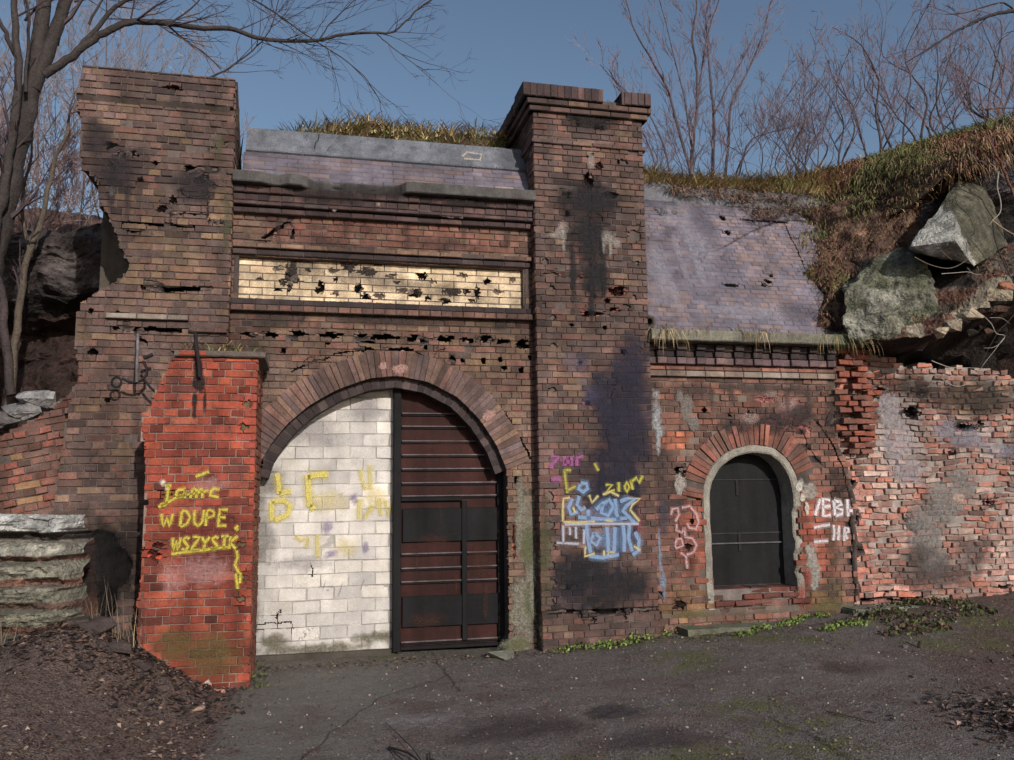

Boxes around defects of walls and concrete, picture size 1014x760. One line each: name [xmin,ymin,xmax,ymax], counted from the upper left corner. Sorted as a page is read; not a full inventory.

spalling [102,137,142,165]
spalling [368,273,438,300]
spalling [457,277,516,304]
water stain [598,452,607,513]
water stain [631,477,639,541]
crack [796,410,865,602]